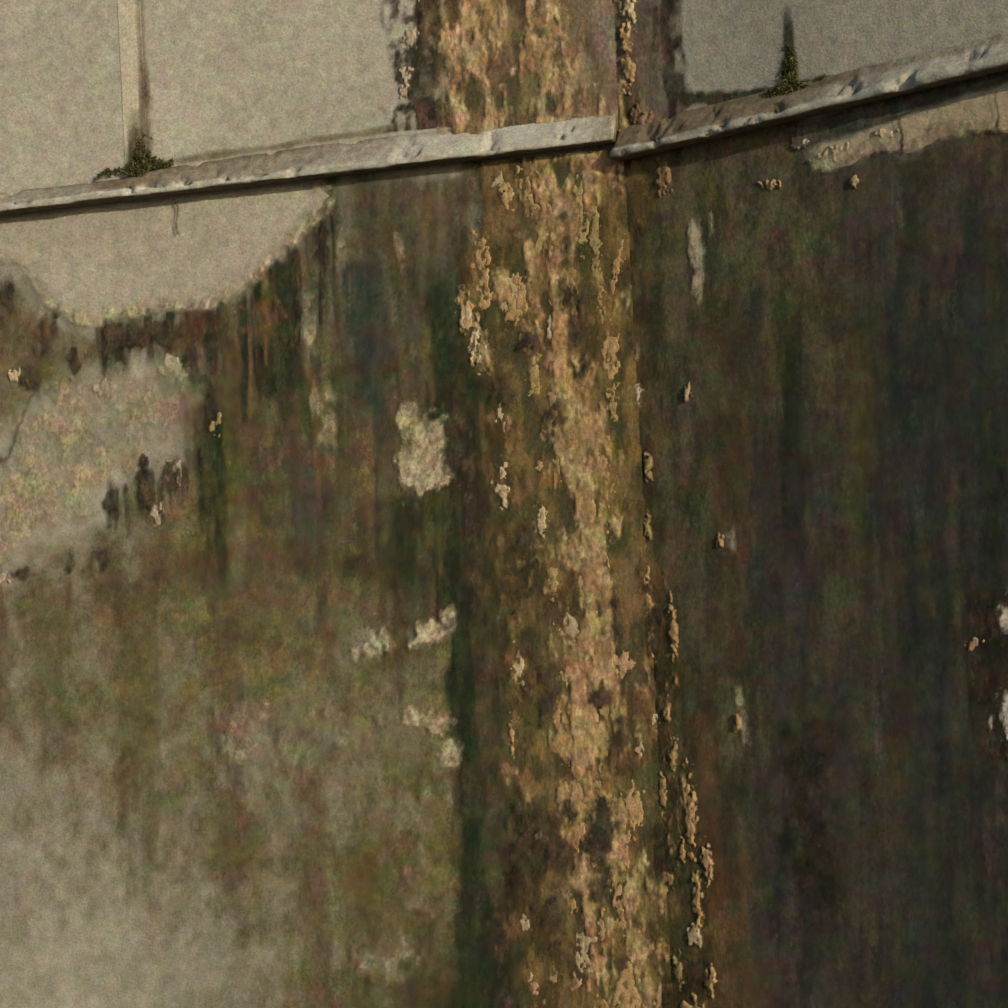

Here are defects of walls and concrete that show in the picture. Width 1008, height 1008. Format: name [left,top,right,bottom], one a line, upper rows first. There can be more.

water stain [129,62,150,176]
water stain [184,150,238,161]
peeling [399,65,415,99]
peeling [432,0,655,135]
water stain [615,0,828,125]
peeling [791,70,1008,189]
crack [896,117,904,156]
crack [993,98,1001,134]
water stain [96,160,534,1008]
peeling [455,146,720,1008]
water stain [625,121,1008,1008]
spalling [989,690,1008,758]